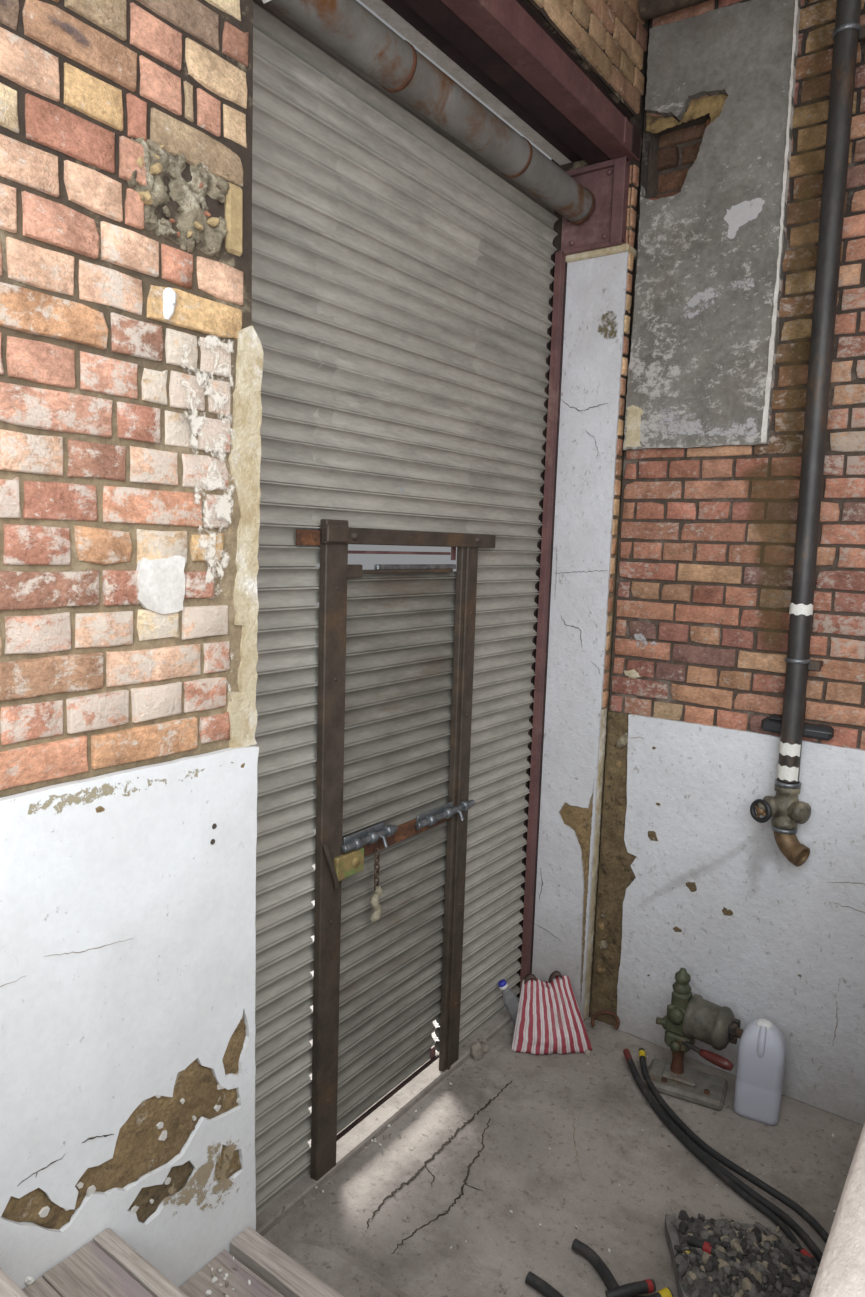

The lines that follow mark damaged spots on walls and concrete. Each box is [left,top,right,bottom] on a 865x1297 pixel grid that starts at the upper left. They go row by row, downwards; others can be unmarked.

spalling [127,137,243,257]
spalling [645,94,728,200]
peeling [10,768,205,815]
flaking render [561,708,636,1027]
spalling [2,1016,246,1229]
crack [367,1081,512,1254]